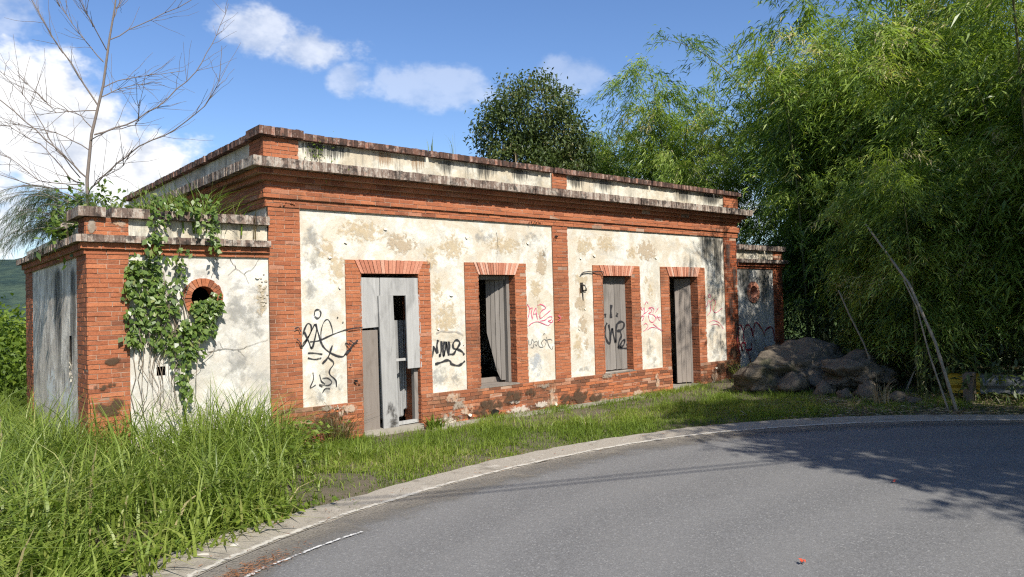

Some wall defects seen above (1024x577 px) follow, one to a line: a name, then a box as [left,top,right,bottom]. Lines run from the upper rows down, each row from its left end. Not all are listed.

water stain [302,142,344,157]
water stain [676,190,717,205]
water stain [54,268,76,353]
spalling [440,393,473,424]